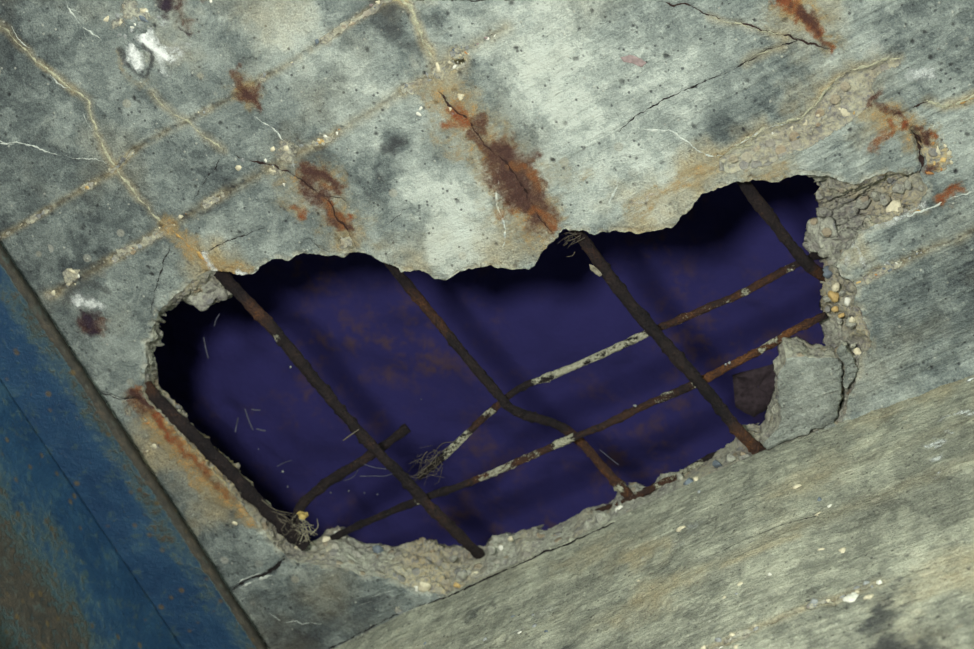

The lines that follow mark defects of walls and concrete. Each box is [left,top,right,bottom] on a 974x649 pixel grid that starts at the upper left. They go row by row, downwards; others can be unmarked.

crack [400,0,514,65]
rust [776,0,835,53]
rust [229,71,262,110]
crack [620,2,902,157]
rust [867,92,939,149]
crack [0,26,263,310]
rust [284,162,362,248]
rust [423,80,562,249]
spalling [144,58,953,595]
crack [329,522,614,649]
spalling [843,580,882,603]
damp [858,578,936,649]